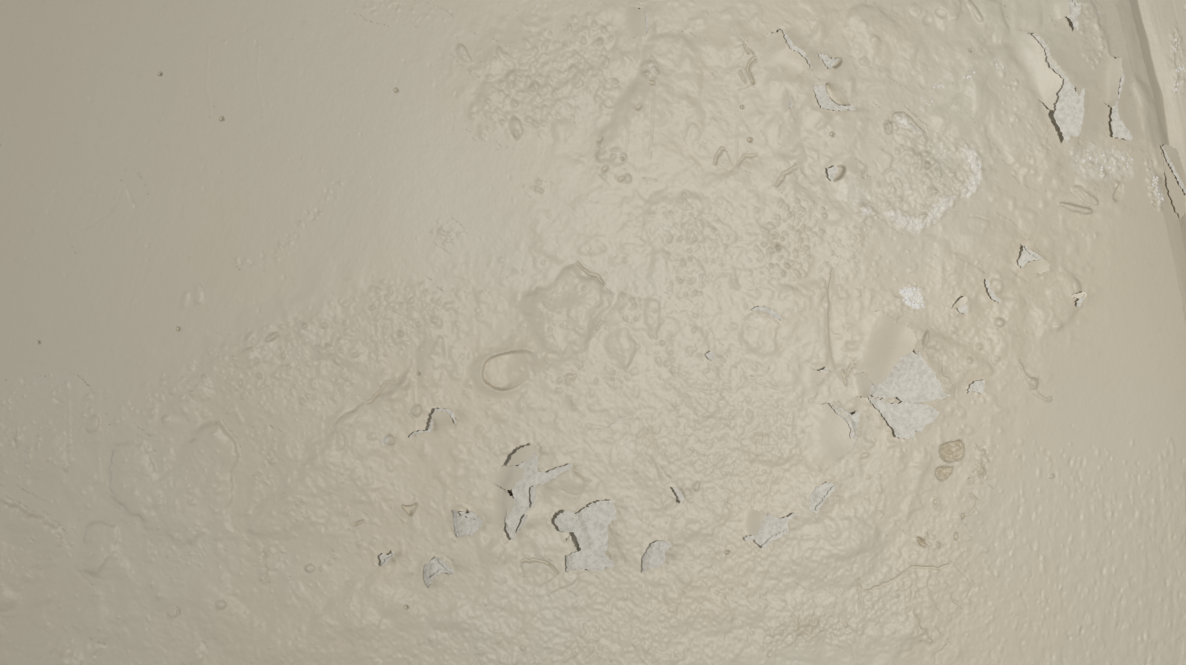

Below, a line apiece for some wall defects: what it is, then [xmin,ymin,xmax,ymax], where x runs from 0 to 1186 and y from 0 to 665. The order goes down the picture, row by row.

peeling [751,29,841,82]
peeling [1003,21,1186,219]
peeling [842,311,951,439]
peeling [489,444,572,540]
peeling [555,500,616,573]
peeling [738,506,796,548]